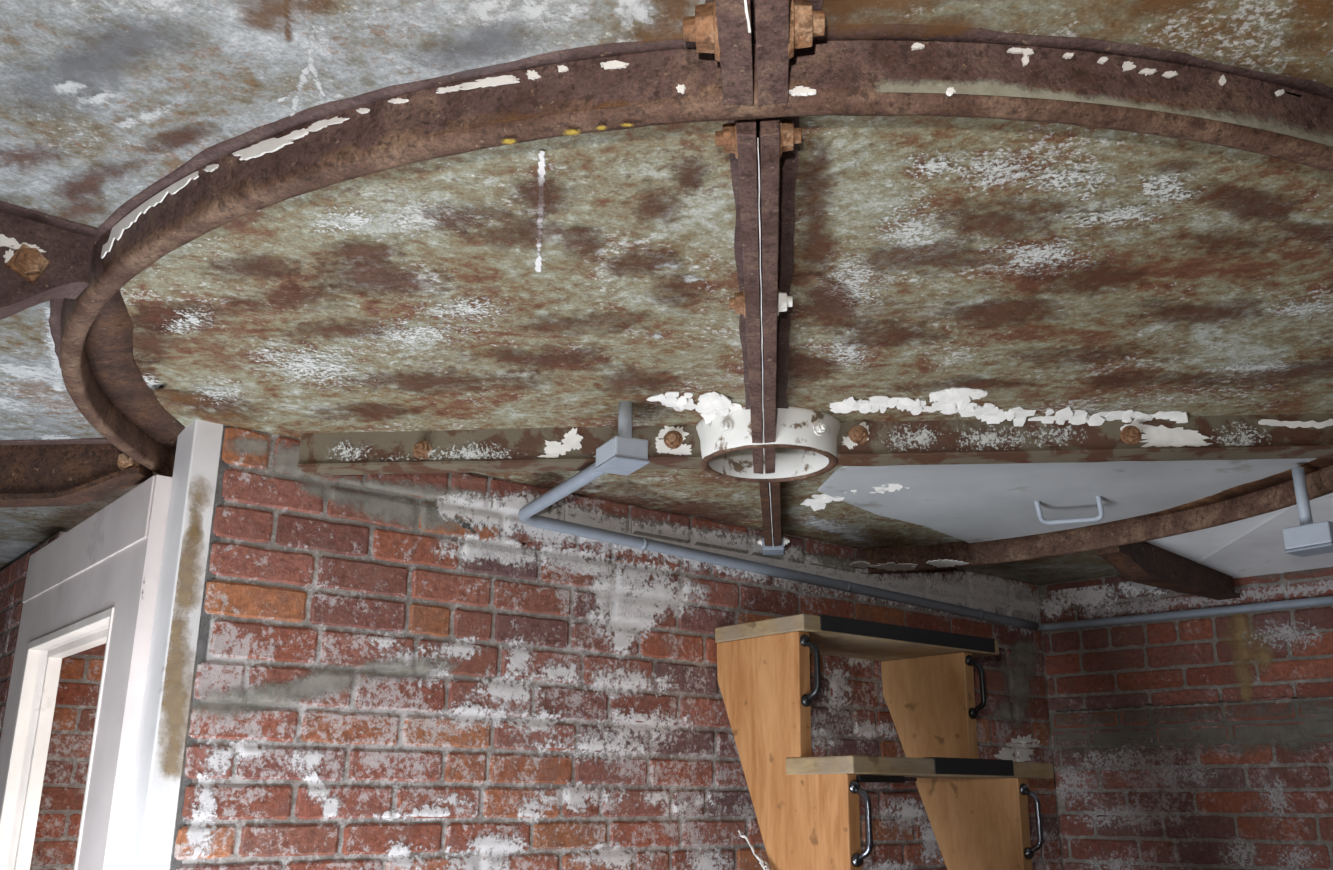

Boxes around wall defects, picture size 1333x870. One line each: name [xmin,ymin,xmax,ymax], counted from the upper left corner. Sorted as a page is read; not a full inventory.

peeling [232,108,370,160]
peeling [101,164,219,259]
rust [211,243,424,308]
rust [132,305,255,421]
rust [319,349,607,420]
peeling [646,391,743,456]
rust [898,377,1033,392]
peeling [830,387,1333,452]
damp [432,491,1333,764]
damp [184,738,267,864]
damp [284,749,340,820]
damp [359,780,716,870]